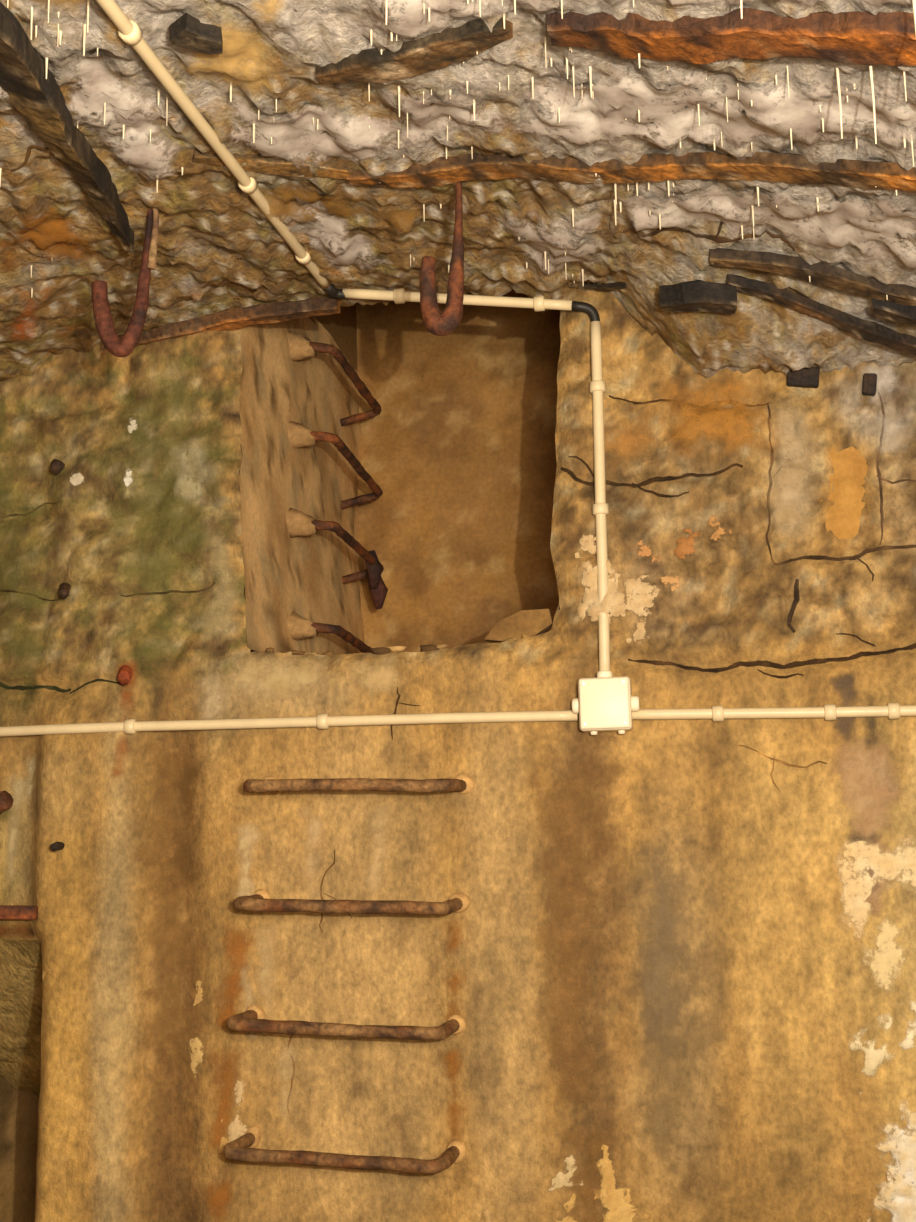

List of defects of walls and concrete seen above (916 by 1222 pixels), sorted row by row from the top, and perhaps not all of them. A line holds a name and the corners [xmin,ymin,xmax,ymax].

damp [362,0,552,38]
efflorescence [61,55,185,180]
efflorescence [229,71,916,167]
efflorescence [296,200,390,270]
efflorescence [502,216,600,274]
efflorescence [620,185,916,269]
damp [70,473,84,486]
efflorescence [177,449,208,498]
crack [560,387,916,679]
crack [0,679,121,694]
spalling [836,746,916,990]
damp [542,758,616,1094]